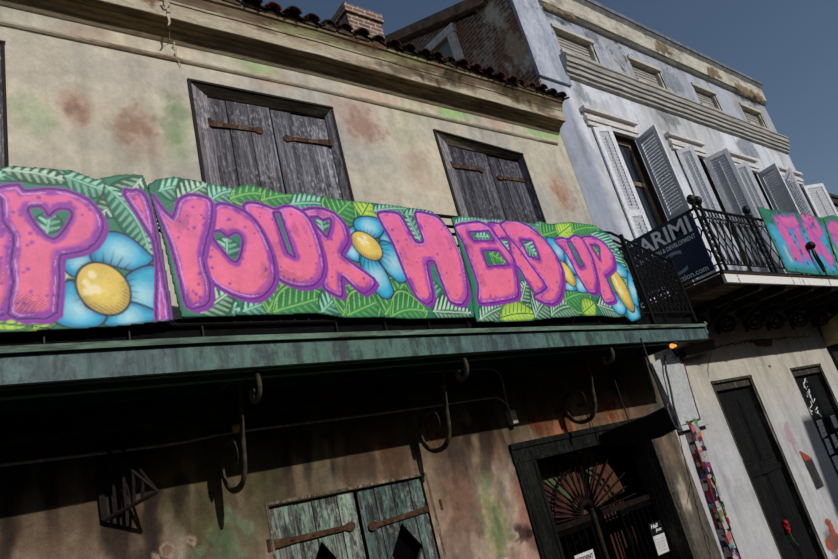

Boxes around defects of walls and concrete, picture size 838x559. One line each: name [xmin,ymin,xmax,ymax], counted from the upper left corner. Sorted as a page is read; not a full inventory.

flaking render [483,1,532,73]
leakage [462,412,493,461]
leakage [515,525,533,541]